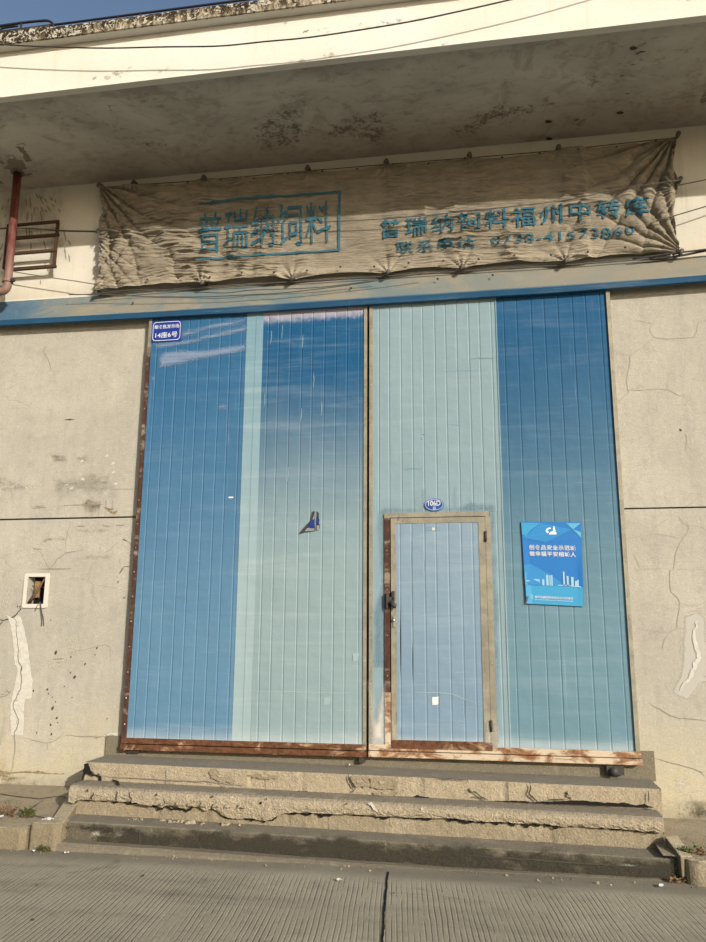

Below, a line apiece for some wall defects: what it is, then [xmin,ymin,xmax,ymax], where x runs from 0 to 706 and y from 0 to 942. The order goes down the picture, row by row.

crack [622,309,705,450]
crack [630,517,706,649]
crack [75,767,567,829]